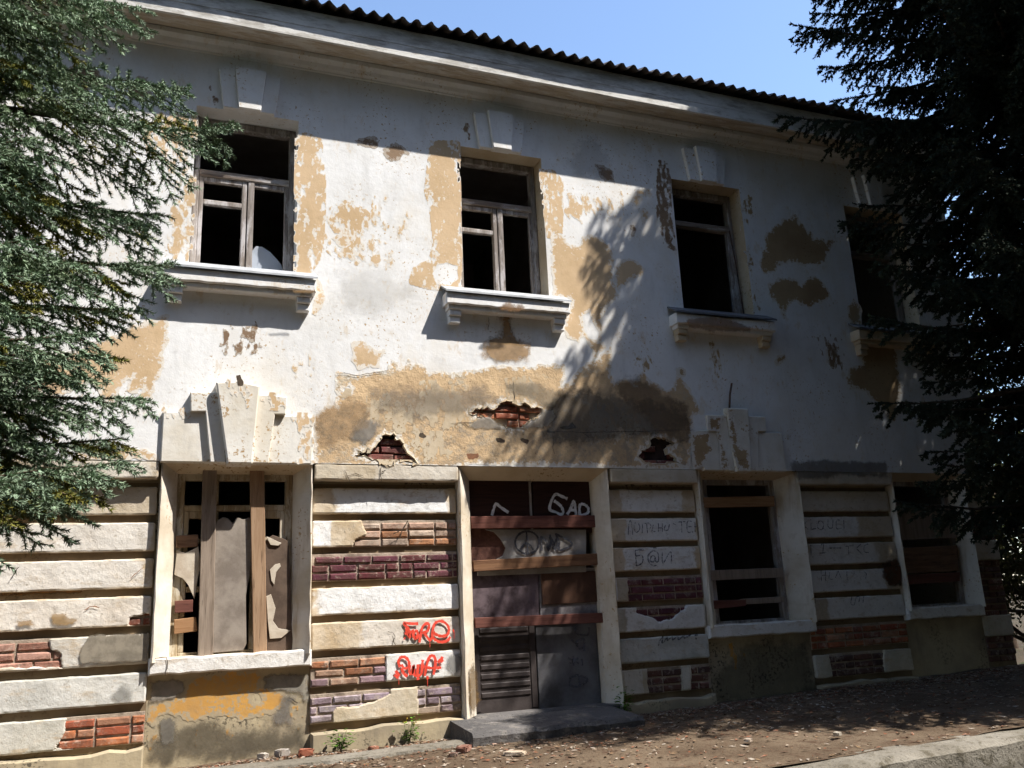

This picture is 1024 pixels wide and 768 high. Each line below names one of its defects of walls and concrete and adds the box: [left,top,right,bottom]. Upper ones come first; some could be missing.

peeling [29,314,170,403]
peeling [293,132,412,316]
peeling [409,123,471,292]
peeling [226,160,750,471]
peeling [740,194,835,319]
flaking render [0,638,62,673]
peeling [49,654,394,752]